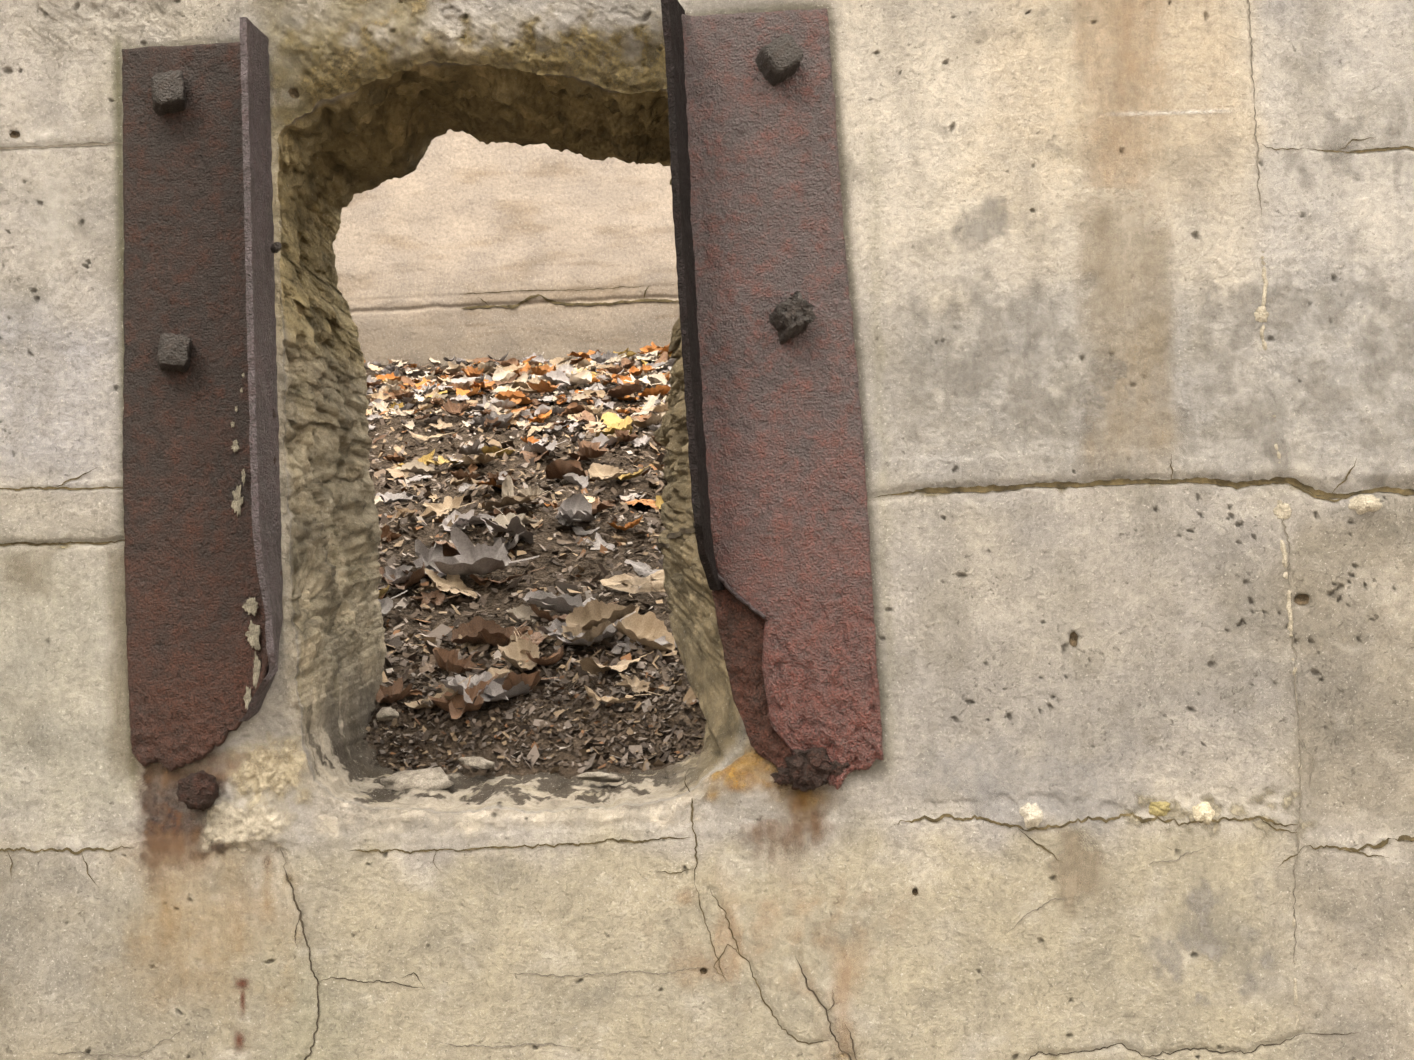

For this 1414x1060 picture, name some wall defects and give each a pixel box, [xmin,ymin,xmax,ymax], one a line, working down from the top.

crack [1247,0,1414,214]
water stain [1203,285,1308,369]
crack [0,467,123,491]
crack [0,539,125,547]
peeling [242,597,261,710]
crack [875,455,1414,964]
rust [142,753,254,861]
rust [711,751,821,829]
crack [0,846,134,888]
crack [280,846,423,1060]
crack [350,777,856,1060]
crack [1029,1033,1355,1060]